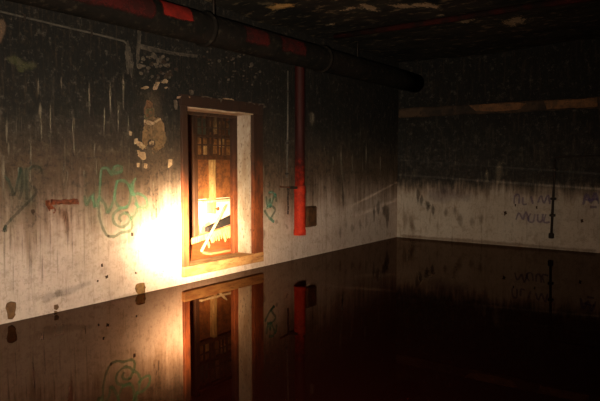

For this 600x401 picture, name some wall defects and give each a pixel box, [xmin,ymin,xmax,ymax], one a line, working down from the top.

flaking render [125,30,261,169]